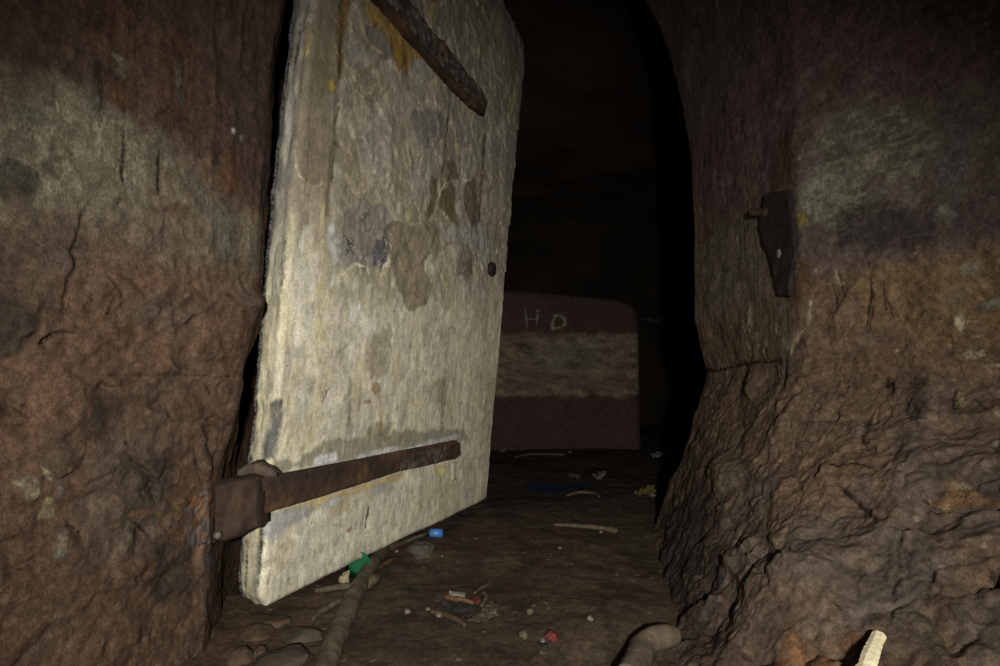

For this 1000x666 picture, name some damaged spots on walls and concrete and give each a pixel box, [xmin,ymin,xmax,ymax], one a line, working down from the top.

corrosion [364,1,422,77]
crack [707,360,787,372]
corrosion [280,475,401,513]
crack [824,410,903,521]